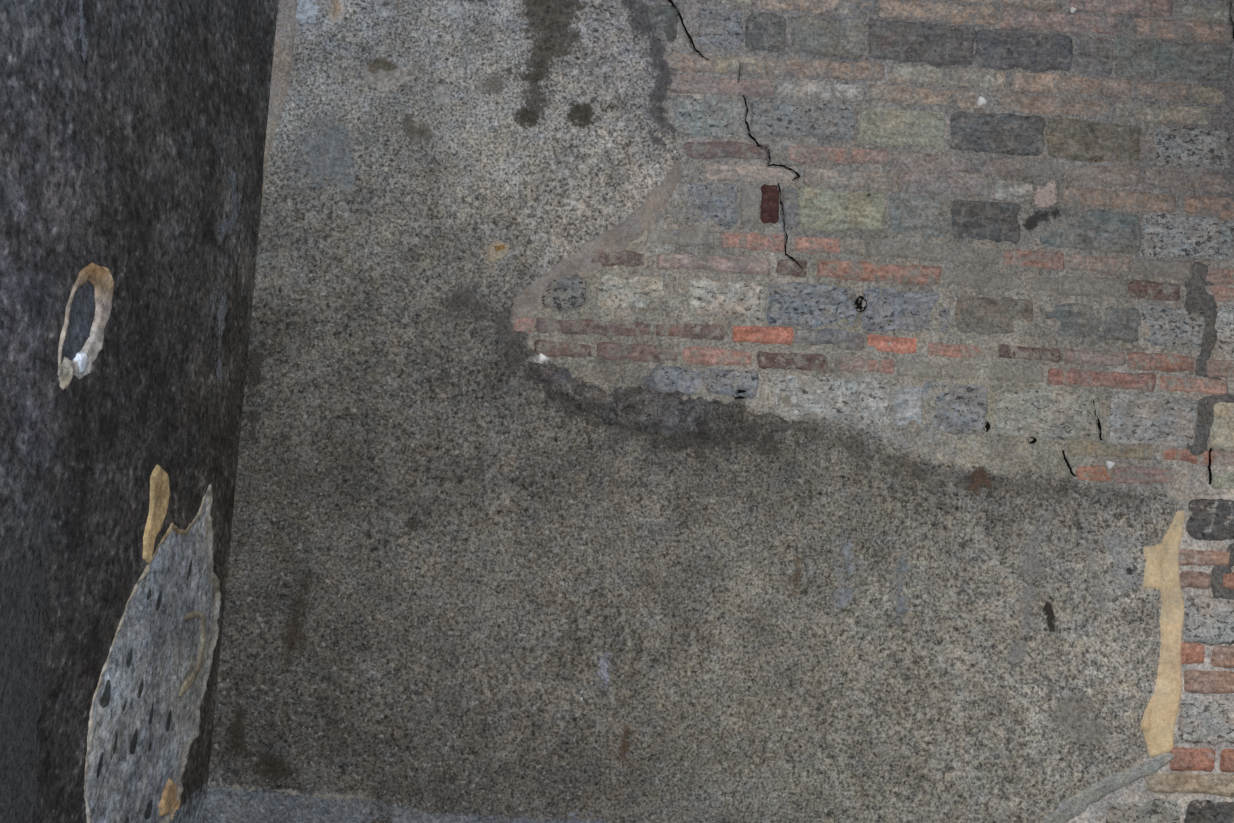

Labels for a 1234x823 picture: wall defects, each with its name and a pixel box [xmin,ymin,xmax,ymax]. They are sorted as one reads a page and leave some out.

water stain [506,0,590,129]
water stain [567,102,596,129]
water stain [622,0,680,145]
crack [668,0,709,60]
crack [738,70,803,269]
spalling [57,262,115,390]
spalling [855,296,867,312]
crack [1206,448,1214,484]
spalling [84,464,221,823]
flaking render [1140,510,1185,758]